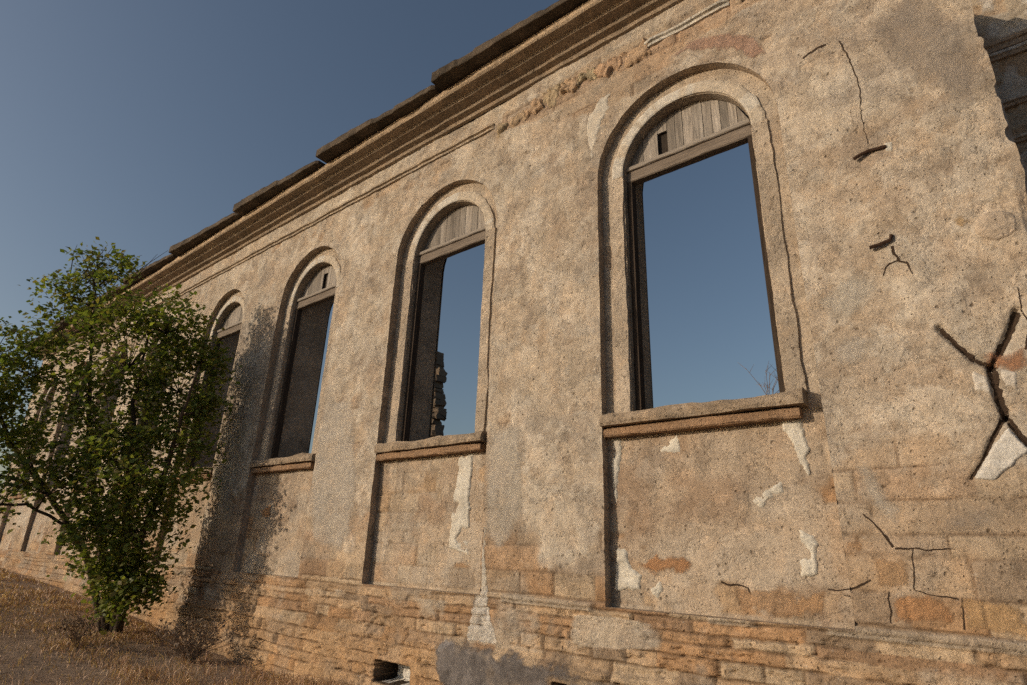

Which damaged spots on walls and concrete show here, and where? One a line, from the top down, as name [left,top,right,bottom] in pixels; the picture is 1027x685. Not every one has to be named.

flaking render [675,33,762,57]
flaking render [497,37,652,138]
flaking render [586,93,611,158]
crack [883,246,913,276]
crack [939,287,1027,480]
flaking render [781,419,810,476]
peeling [975,428,1027,480]
flaking render [449,454,474,555]
flaking render [488,429,520,546]
flaking render [614,548,689,598]
flaking render [799,530,818,577]
crack [828,514,965,630]